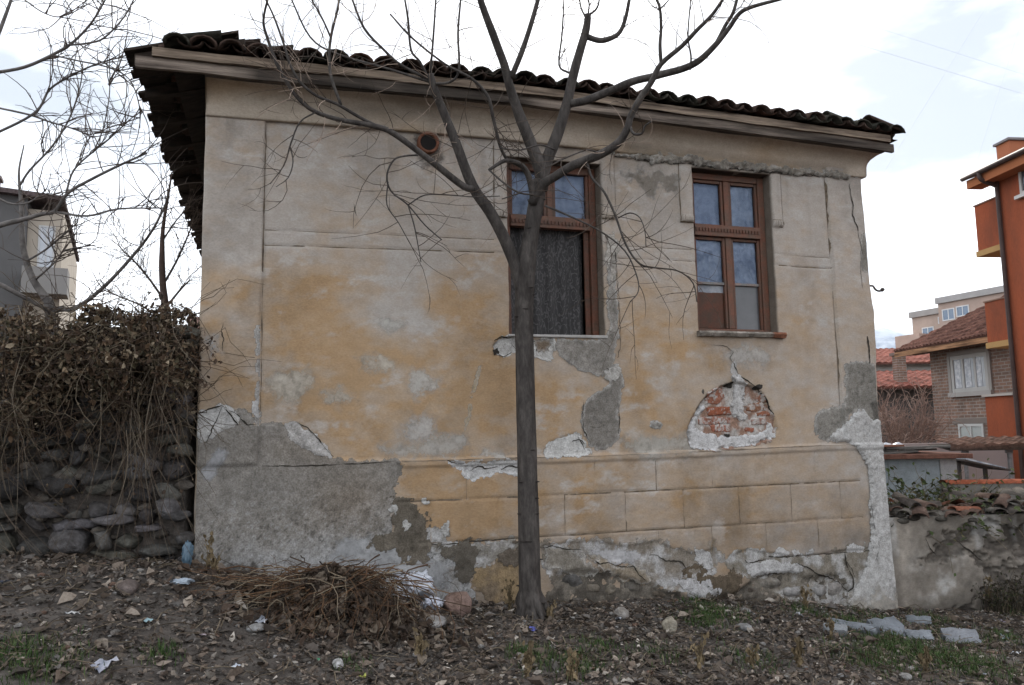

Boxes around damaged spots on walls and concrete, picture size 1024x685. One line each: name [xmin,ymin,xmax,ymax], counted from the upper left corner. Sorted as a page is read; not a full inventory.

crack [615,156,863,288]
peeling [493,335,515,358]
crack [719,345,774,414]
peeling [197,397,260,443]
peeling [284,421,333,459]
peeling [447,458,518,482]
peeling [543,432,593,460]
spalling [686,374,777,452]
peeling [426,526,458,552]
peeling [471,535,519,604]
peeling [540,533,869,606]
crack [745,550,869,599]